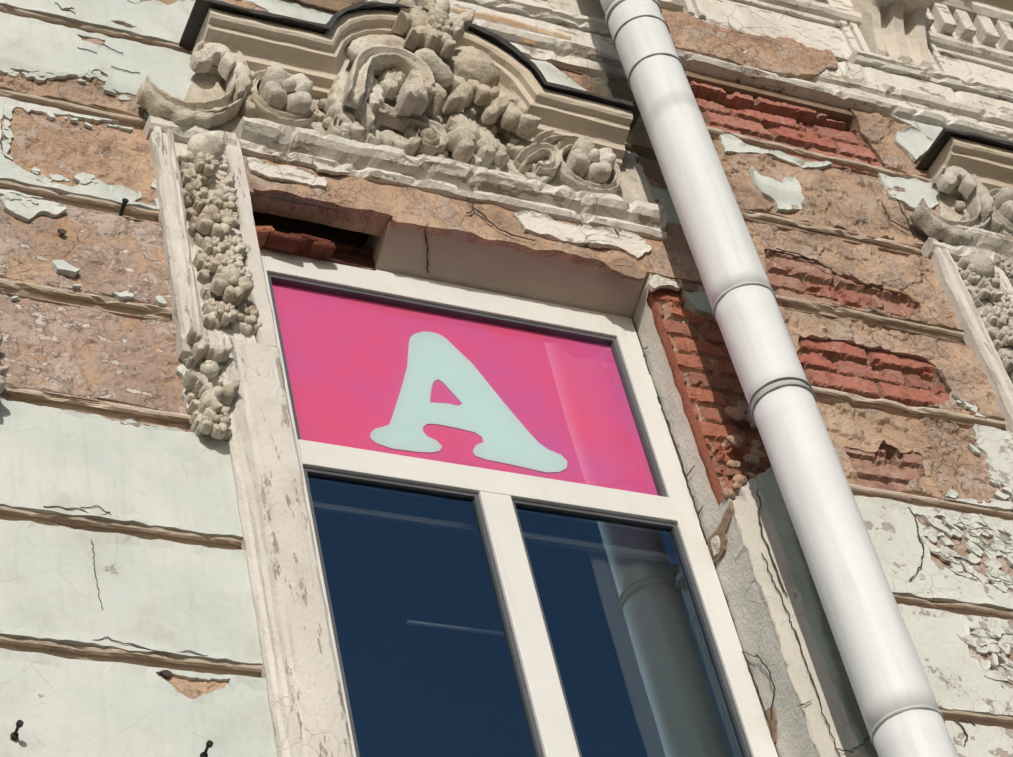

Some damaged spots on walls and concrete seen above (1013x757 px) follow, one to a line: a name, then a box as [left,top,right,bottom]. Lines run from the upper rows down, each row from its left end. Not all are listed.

peeling [230,0,267,12]
peeling [0,68,159,208]
spalling [626,125,668,203]
peeling [0,192,190,415]
peeling [661,9,1013,593]
flaking render [512,210,772,563]
crack [43,505,111,515]
crack [91,539,103,609]
crack [93,636,208,656]
peeling [158,674,229,699]
crack [742,489,870,757]
peeling [956,626,1013,685]